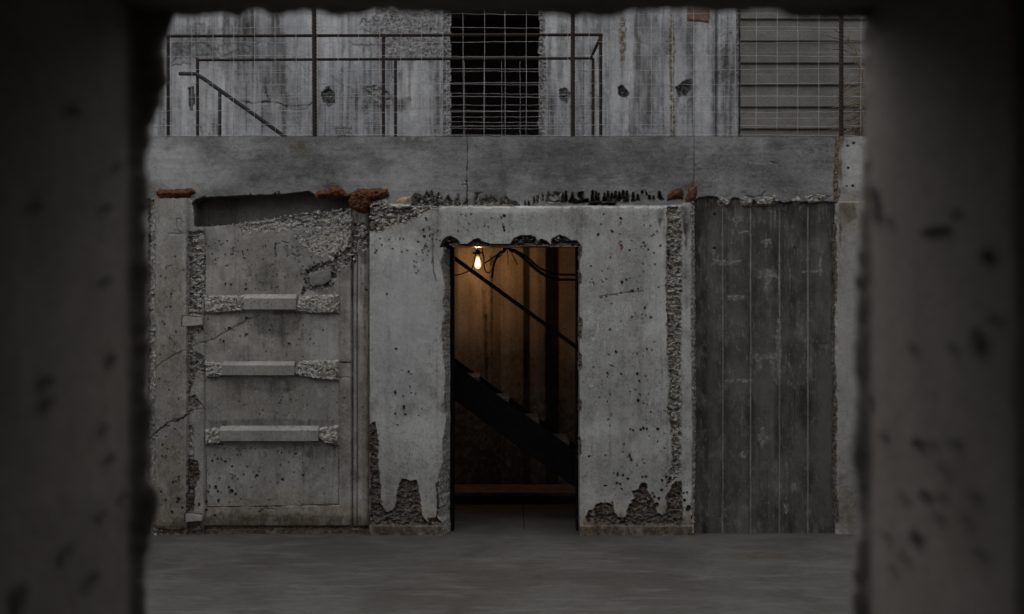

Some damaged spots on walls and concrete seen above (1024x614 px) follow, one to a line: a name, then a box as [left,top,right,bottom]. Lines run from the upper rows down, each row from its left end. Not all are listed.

spalling [321,86,335,106]
spalling [618,85,629,98]
spalling [675,79,692,97]
corrosion [156,188,196,198]
corrosion [314,185,390,213]
corrosion [667,186,697,202]
spalling [148,190,697,535]
crack [155,414,188,433]